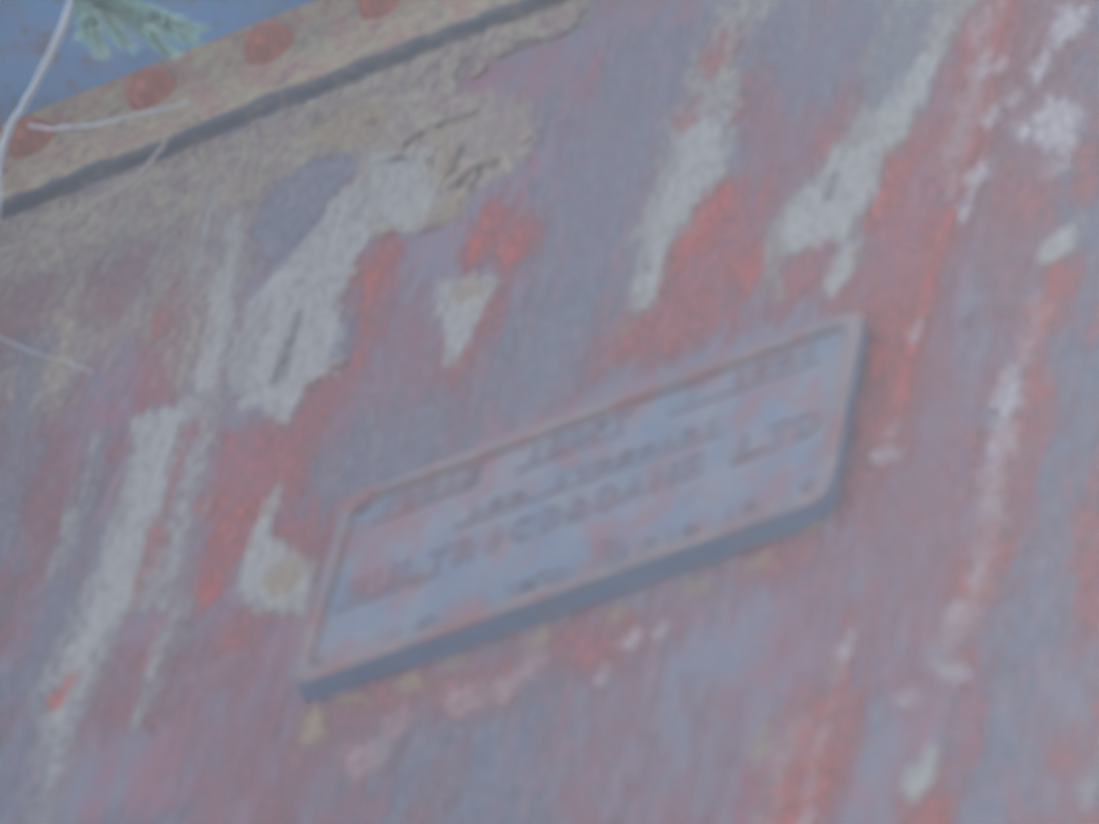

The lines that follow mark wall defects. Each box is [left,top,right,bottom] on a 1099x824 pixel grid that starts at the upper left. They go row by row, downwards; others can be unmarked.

peeling [214,180,378,430]
peeling [430,270,503,371]
peeling [230,483,317,622]